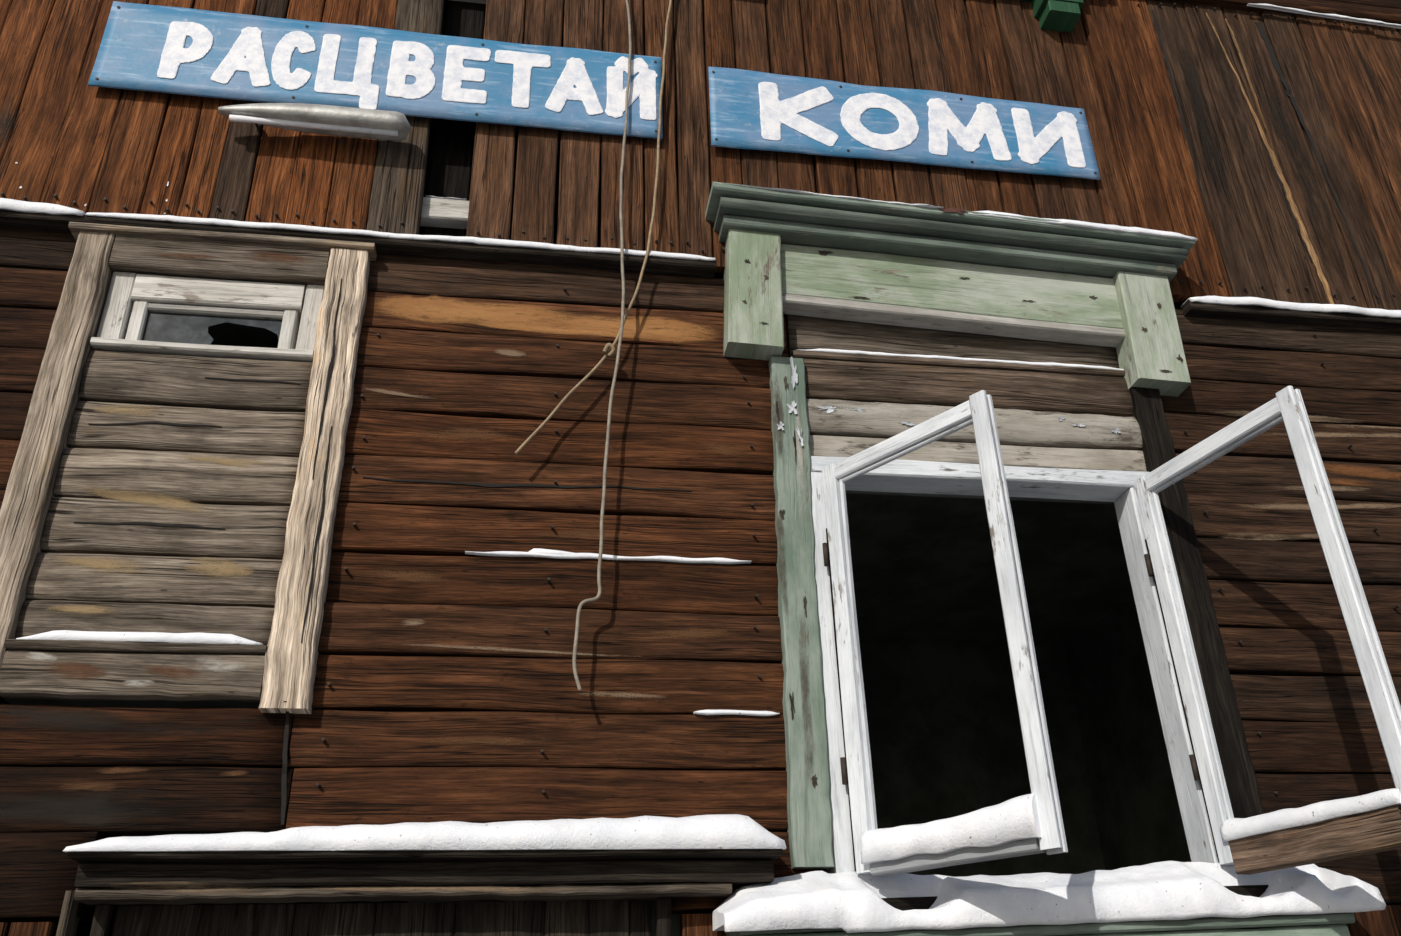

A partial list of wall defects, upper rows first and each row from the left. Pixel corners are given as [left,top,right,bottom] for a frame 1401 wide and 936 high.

crack [1206,12,1380,304]
peeling [773,356,804,475]
peeling [778,509,807,618]
peeling [789,667,811,729]